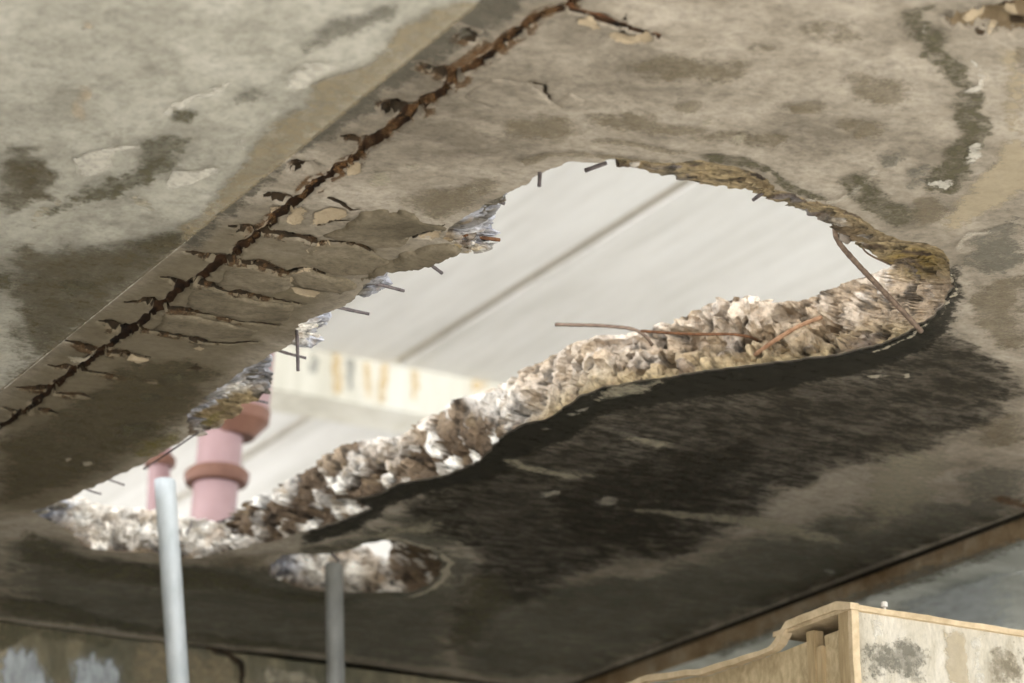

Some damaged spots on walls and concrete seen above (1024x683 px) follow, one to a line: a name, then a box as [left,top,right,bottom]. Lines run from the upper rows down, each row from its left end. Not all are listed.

rust [381,0,581,136]
spalling [578,15,652,44]
damp [0,0,519,378]
rust [233,139,370,246]
crack [0,0,661,429]
spalling [126,352,150,363]
spalling [154,158,954,558]
damp [300,5,1024,679]
damp [0,530,167,683]
spalling [32,496,159,554]
damp [181,553,326,683]
spalling [265,541,442,593]